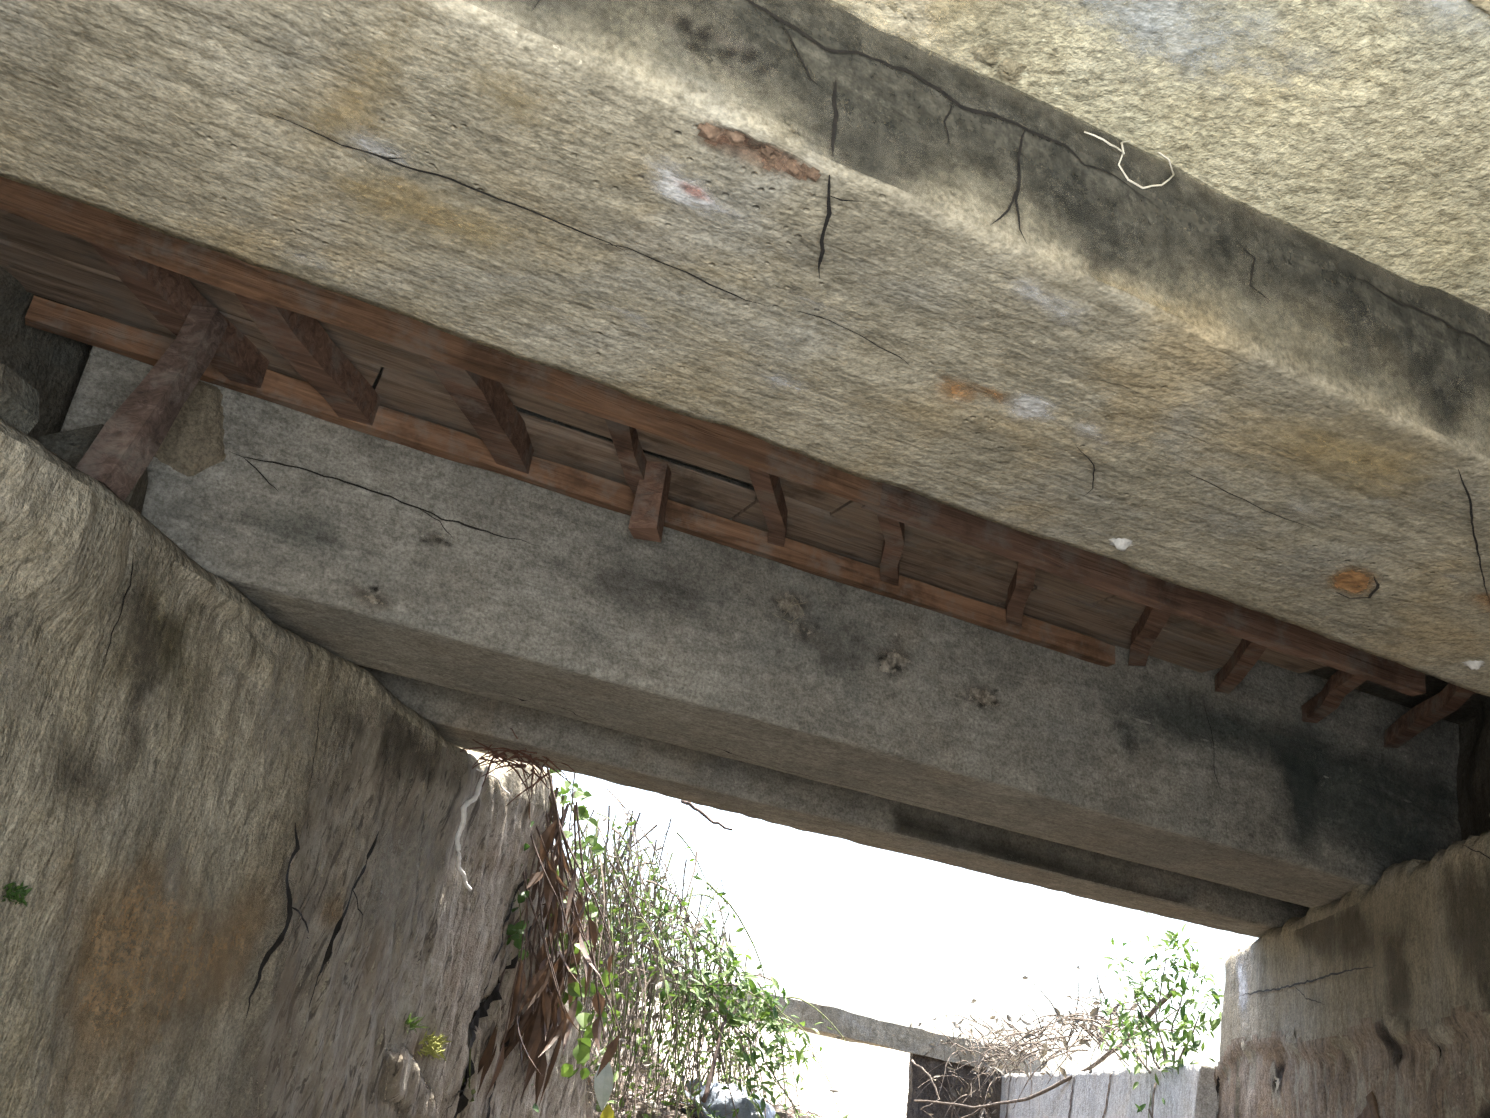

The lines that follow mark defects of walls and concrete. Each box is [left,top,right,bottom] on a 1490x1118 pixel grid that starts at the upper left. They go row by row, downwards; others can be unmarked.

crack [747,0,1159,279]
crack [270,113,909,365]
leakage [684,0,1490,425]
crack [229,451,542,547]
leakage [1109,538,1133,551]
rust [1332,569,1380,599]
crack [1458,469,1490,603]
crack [246,693,379,1018]
crack [448,874,540,1118]
crack [1244,965,1375,1005]
flaking render [1214,1005,1490,1118]